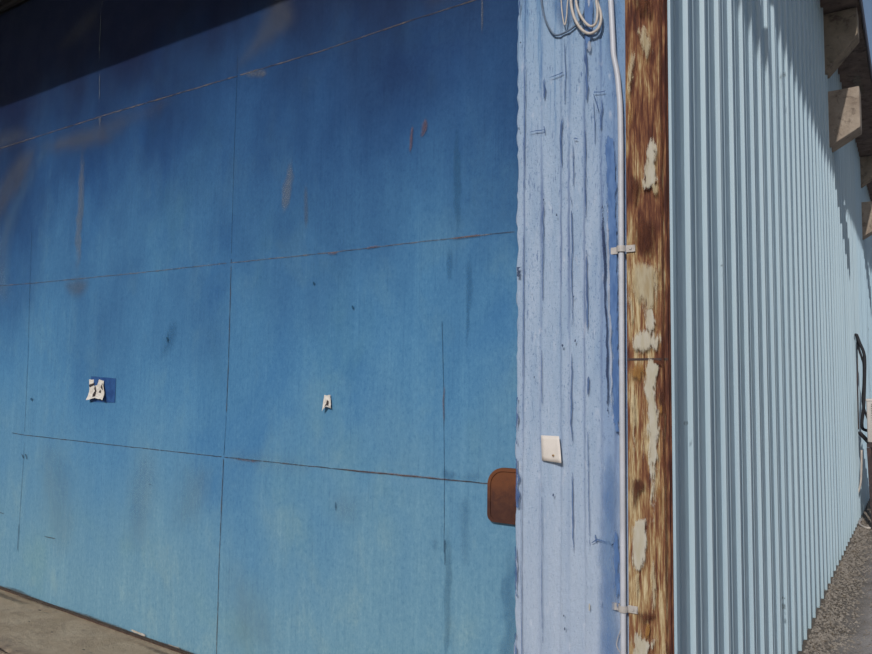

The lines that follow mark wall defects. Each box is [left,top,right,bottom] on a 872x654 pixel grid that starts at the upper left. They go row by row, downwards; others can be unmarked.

peeling [628,27,650,92]
peeling [642,138,658,193]
corrosion [635,0,668,654]
corrosion [632,478,644,504]
damp [604,484,620,654]